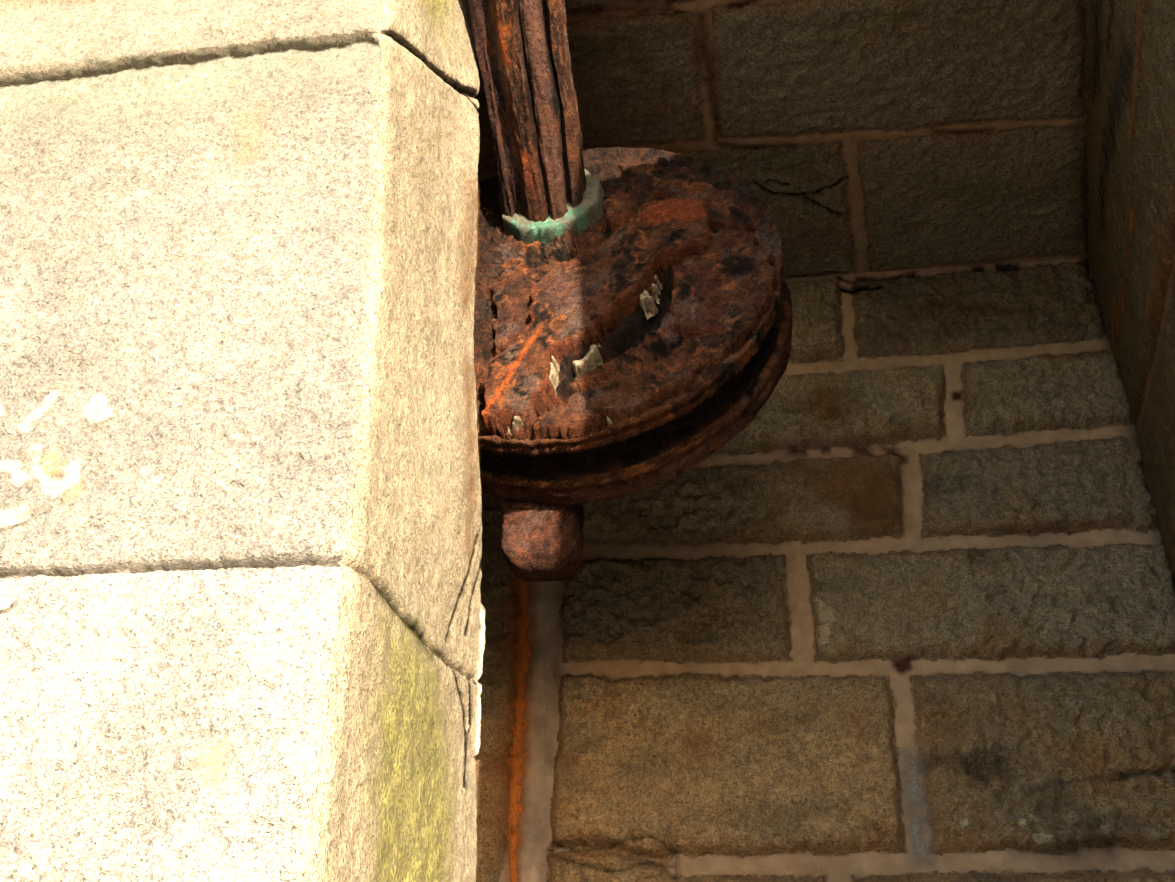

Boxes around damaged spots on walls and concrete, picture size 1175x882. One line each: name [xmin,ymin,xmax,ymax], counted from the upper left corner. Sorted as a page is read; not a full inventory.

crack [754,176,848,215]
crack [445,534,481,787]
rust [503,576,533,882]